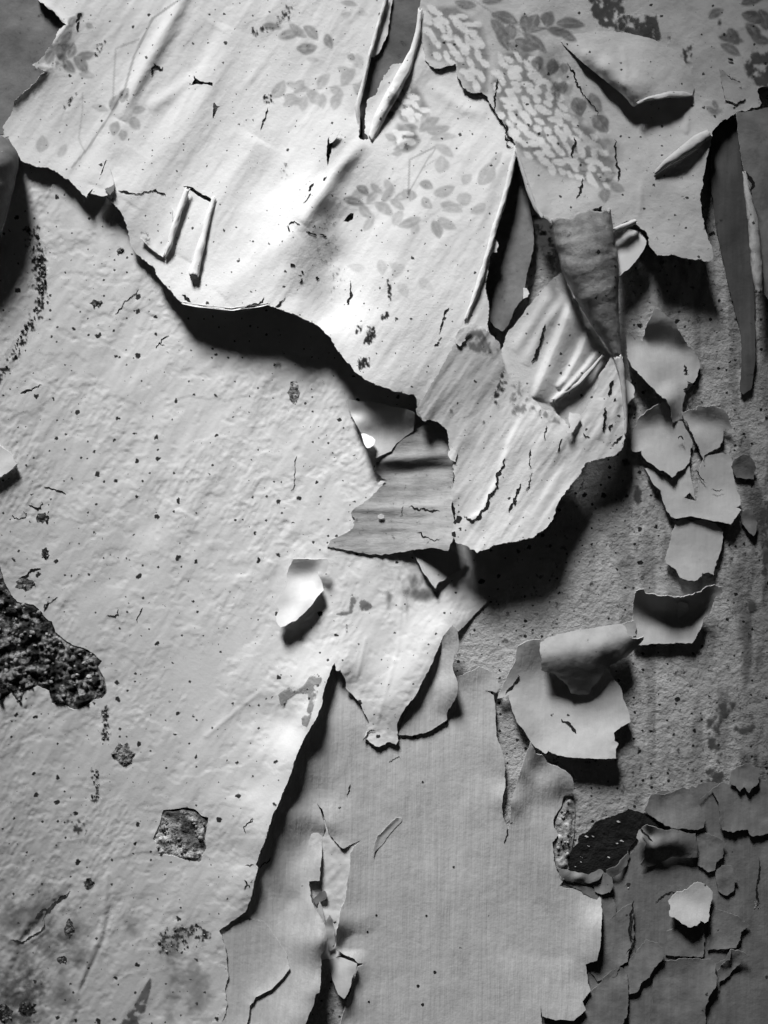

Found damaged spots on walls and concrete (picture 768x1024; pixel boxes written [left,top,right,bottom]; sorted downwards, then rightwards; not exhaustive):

peeling [0,156,524,1024]
peeling [622,308,757,645]
peeling [220,639,750,1024]
peeling [710,782,768,836]